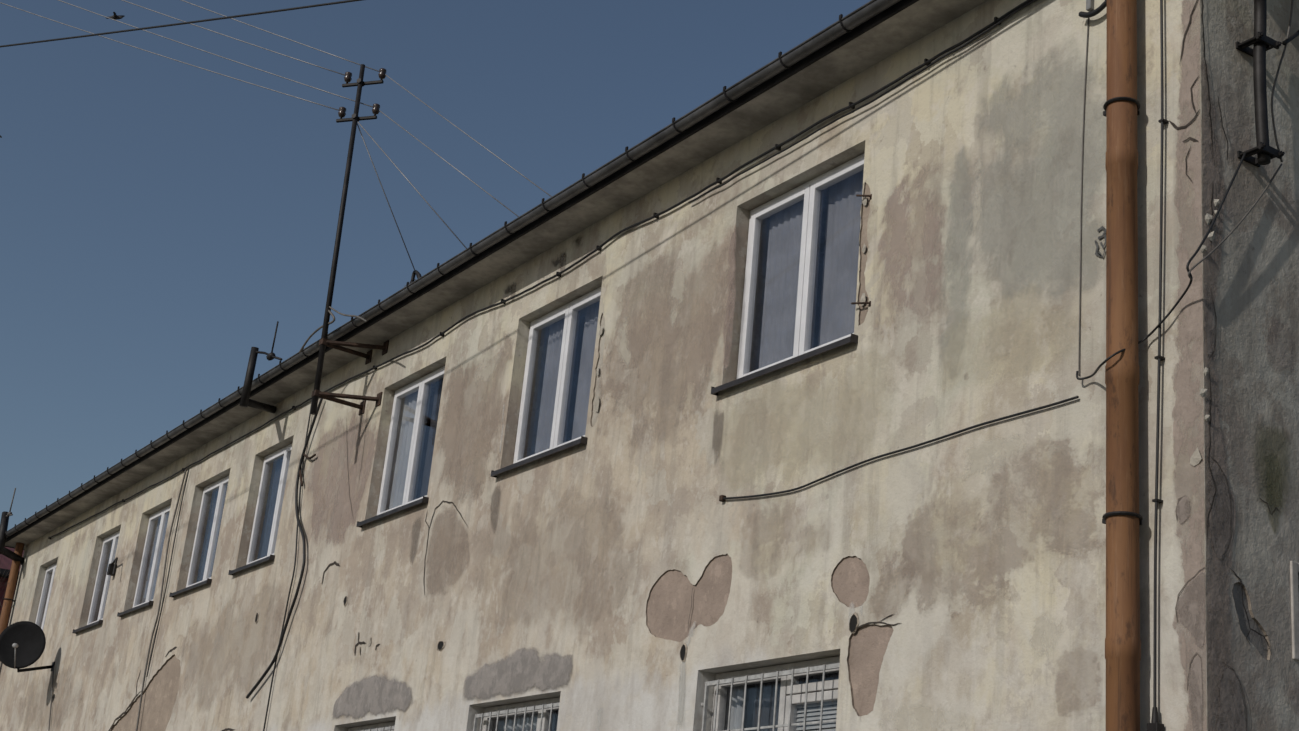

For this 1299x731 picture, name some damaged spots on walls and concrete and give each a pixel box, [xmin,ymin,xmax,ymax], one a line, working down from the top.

spalling [1169,0,1271,731]
peeling [110,654,181,731]
peeling [646,554,732,721]
peeling [831,556,894,716]